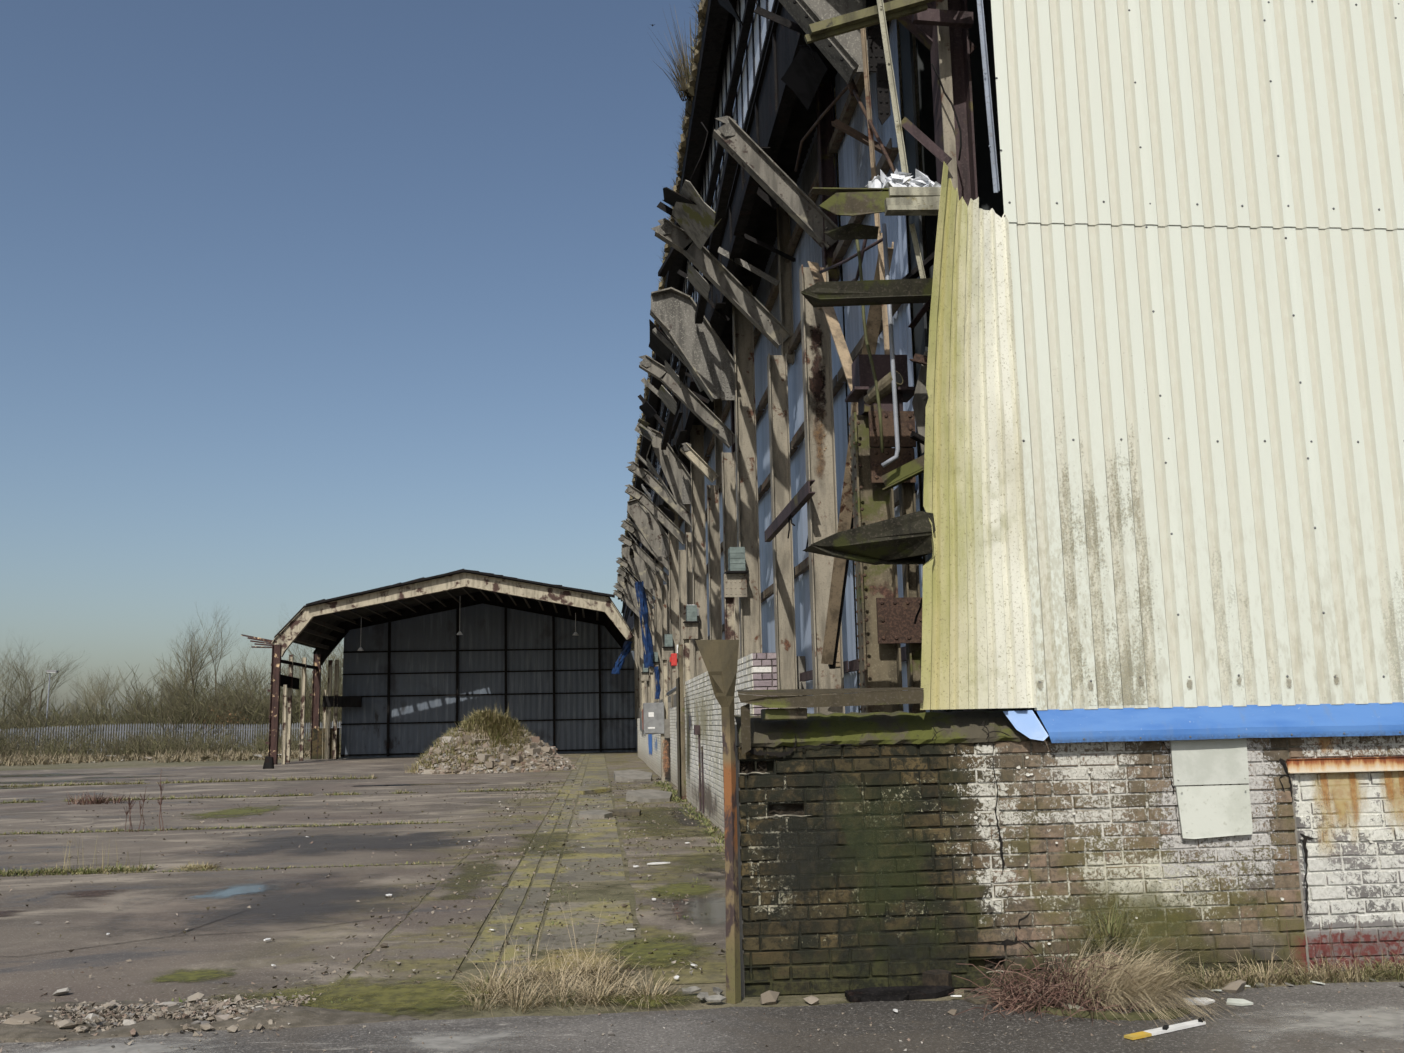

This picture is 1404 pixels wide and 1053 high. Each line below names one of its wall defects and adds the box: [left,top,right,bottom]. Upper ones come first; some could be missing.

damp [1060,426,1159,706]
damp [736,742,1014,997]
crack [982,720,1010,874]
peeling [738,735,1404,968]
crack [1279,758,1317,922]
rust [1318,772,1360,843]
rust [1384,771,1404,818]
spalling [985,958,1005,973]